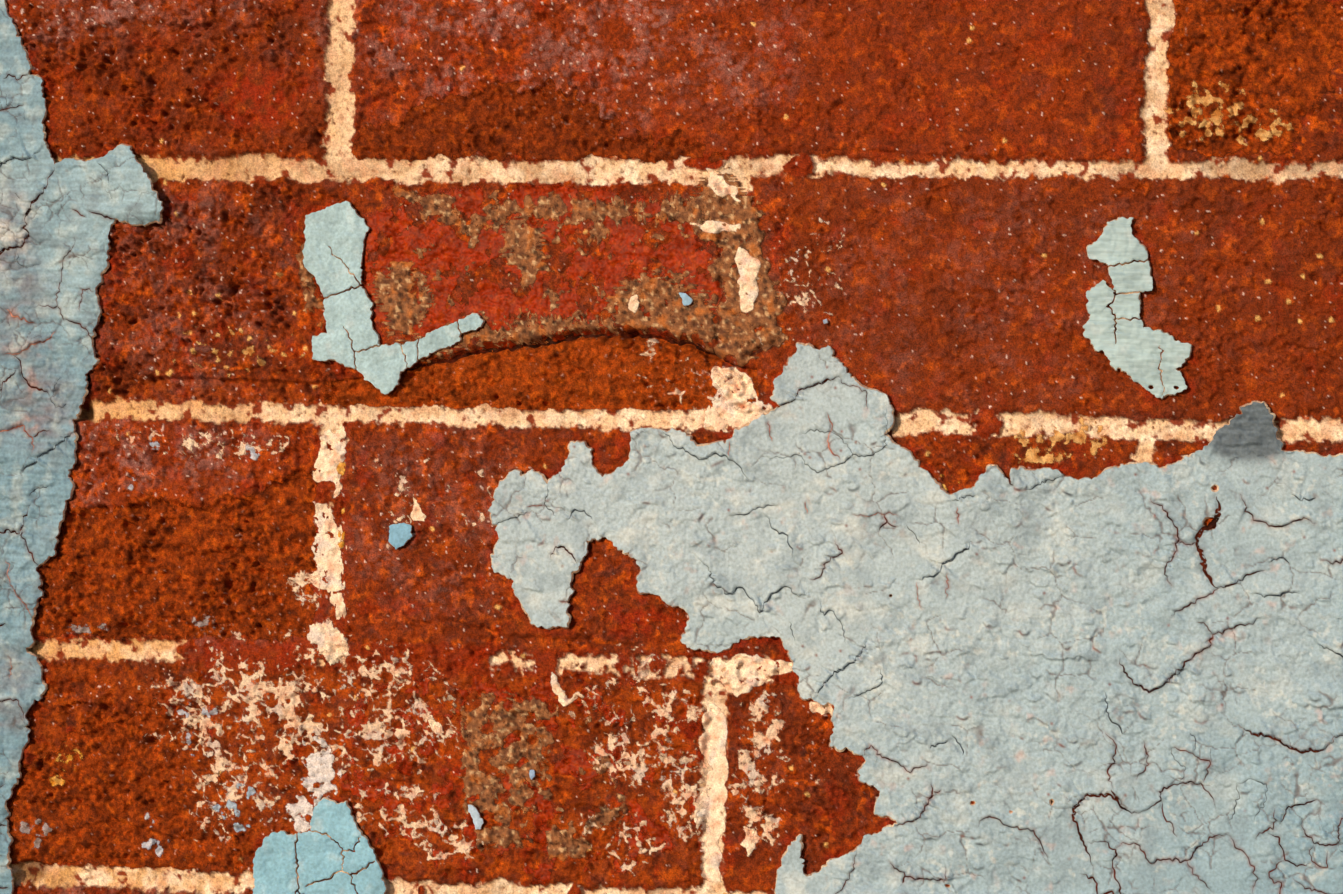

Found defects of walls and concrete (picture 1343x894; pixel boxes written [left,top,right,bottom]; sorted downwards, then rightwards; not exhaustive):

crack [0,152,113,626]
damp [138,631,484,861]
spalling [0,0,695,894]
crack [496,486,592,561]
damp [569,643,709,876]
crack [662,377,888,552]
crack [700,543,883,697]
peeling [302,77,1343,894]
crack [861,735,964,826]
crack [853,495,974,605]
crack [893,866,946,883]
crack [1072,494,1343,894]